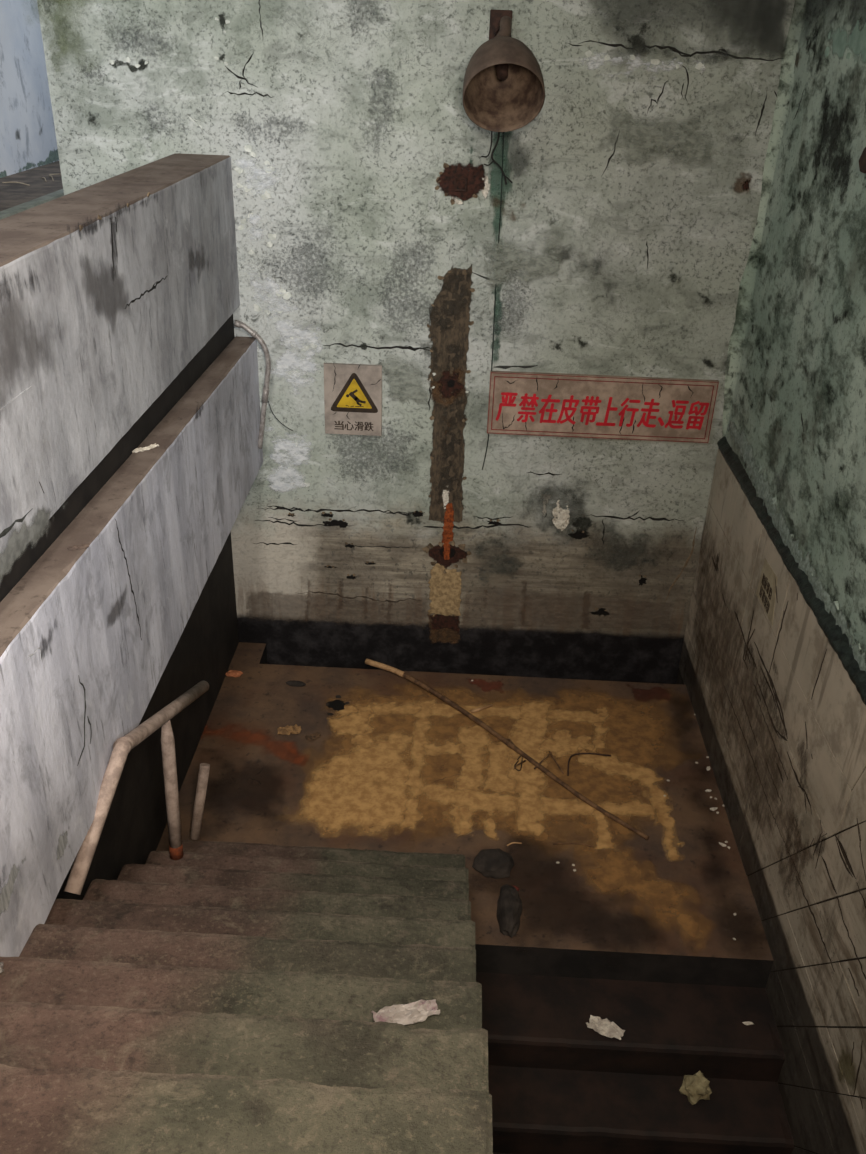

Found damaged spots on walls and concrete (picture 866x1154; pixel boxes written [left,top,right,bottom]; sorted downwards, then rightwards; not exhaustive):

flaking render [110,57,148,72]
crack [225,0,275,98]
water stain [617,24,649,54]
crack [568,40,783,114]
mould [812,92,854,203]
corrosion [435,163,499,205]
crack [323,342,431,355]
corrosion [429,370,469,434]
crack [0,482,44,538]
corrosion [441,490,454,560]
water stain [529,487,654,570]
water stain [728,423,866,671]